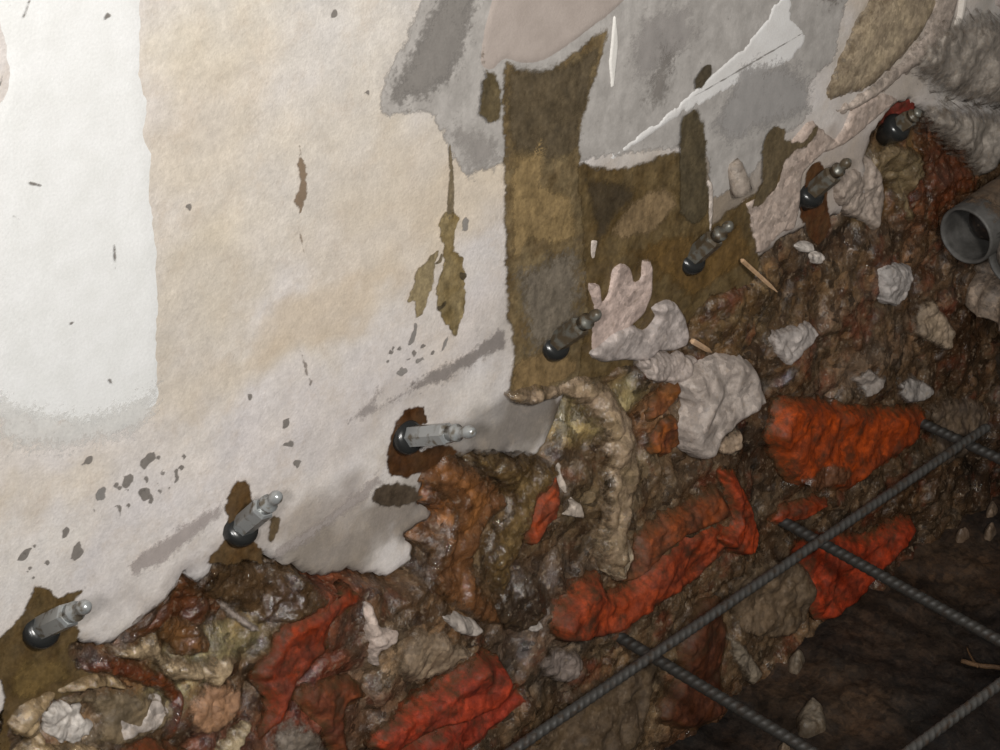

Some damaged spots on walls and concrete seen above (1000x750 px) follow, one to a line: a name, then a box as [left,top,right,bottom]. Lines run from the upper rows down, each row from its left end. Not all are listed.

flaking render [746,0,958,253]
damp [408,146,467,336]
damp [479,31,818,395]
peeling [18,545,36,579]
peeling [71,542,84,561]
peeling [94,452,186,512]
spalling [178,110,1000,750]
spalling [0,719,23,750]
spalling [40,579,363,750]